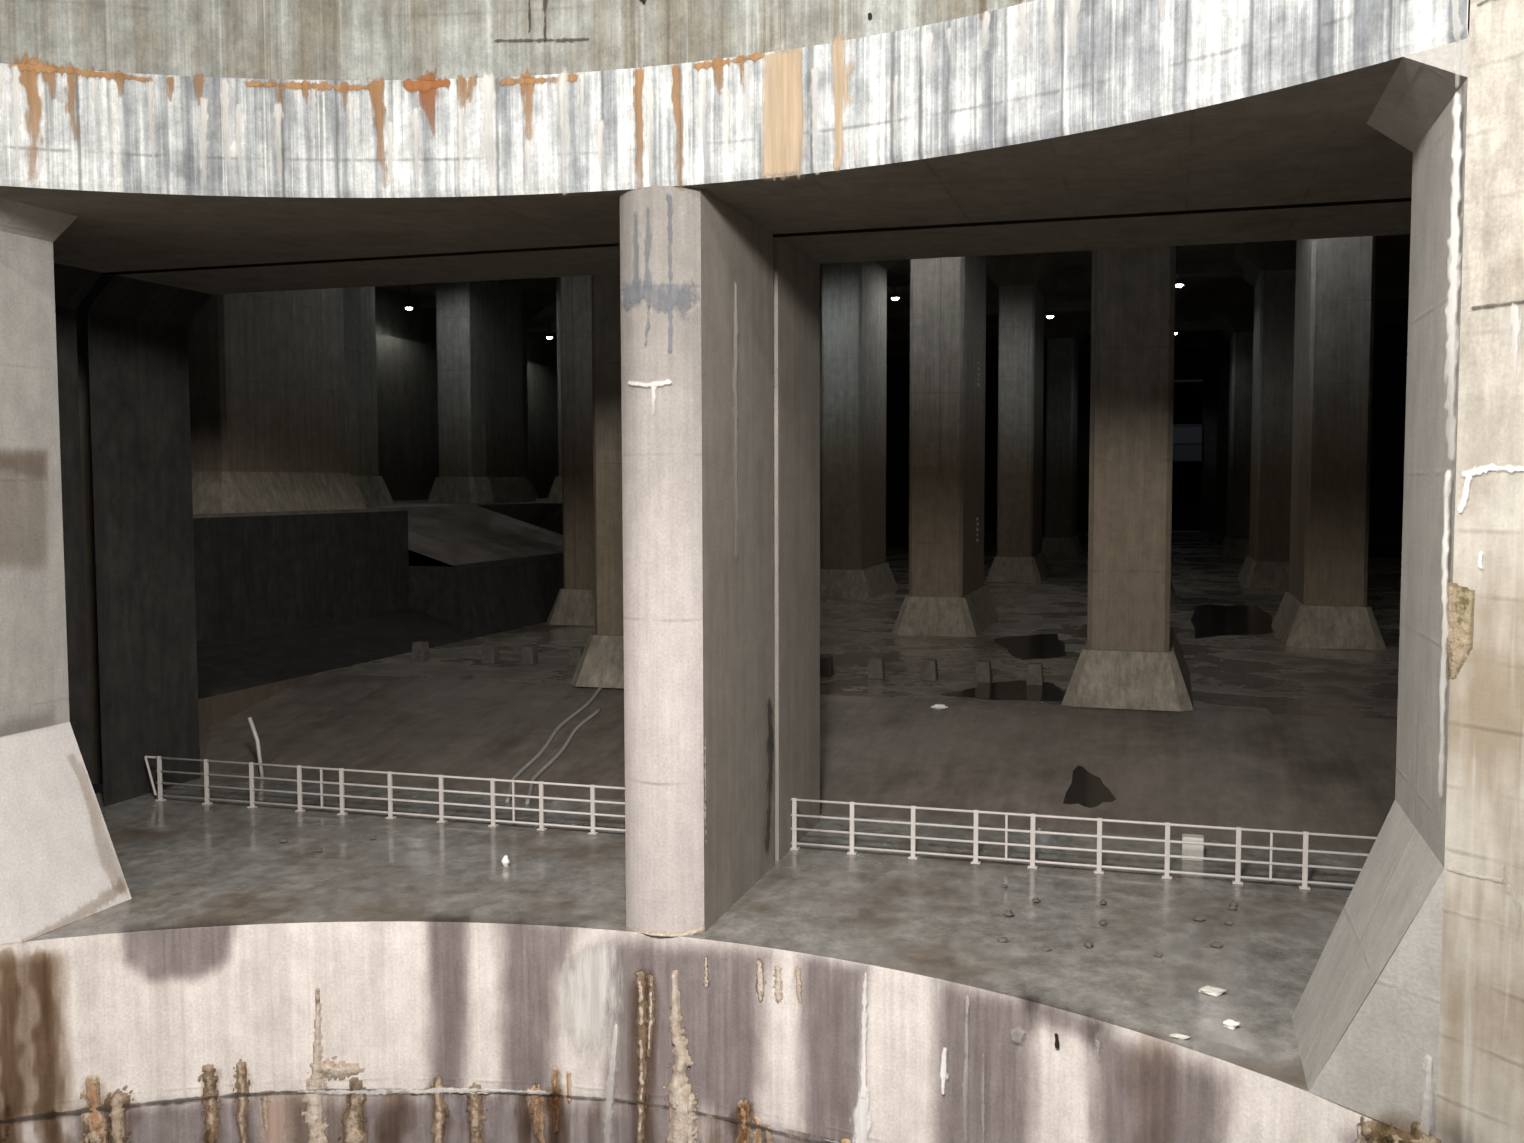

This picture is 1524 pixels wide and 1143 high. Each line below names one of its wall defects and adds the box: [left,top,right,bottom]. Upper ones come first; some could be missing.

rust [9,54,174,150]
rust [246,78,386,159]
rust [403,73,477,122]
rust [500,70,578,130]
rust [633,66,644,159]
rust [671,48,803,179]
damp [79,1075,134,1143]
damp [198,1057,271,1143]
damp [302,988,572,1143]
damp [561,944,617,1110]
damp [634,969,699,1143]
damp [825,973,872,1143]